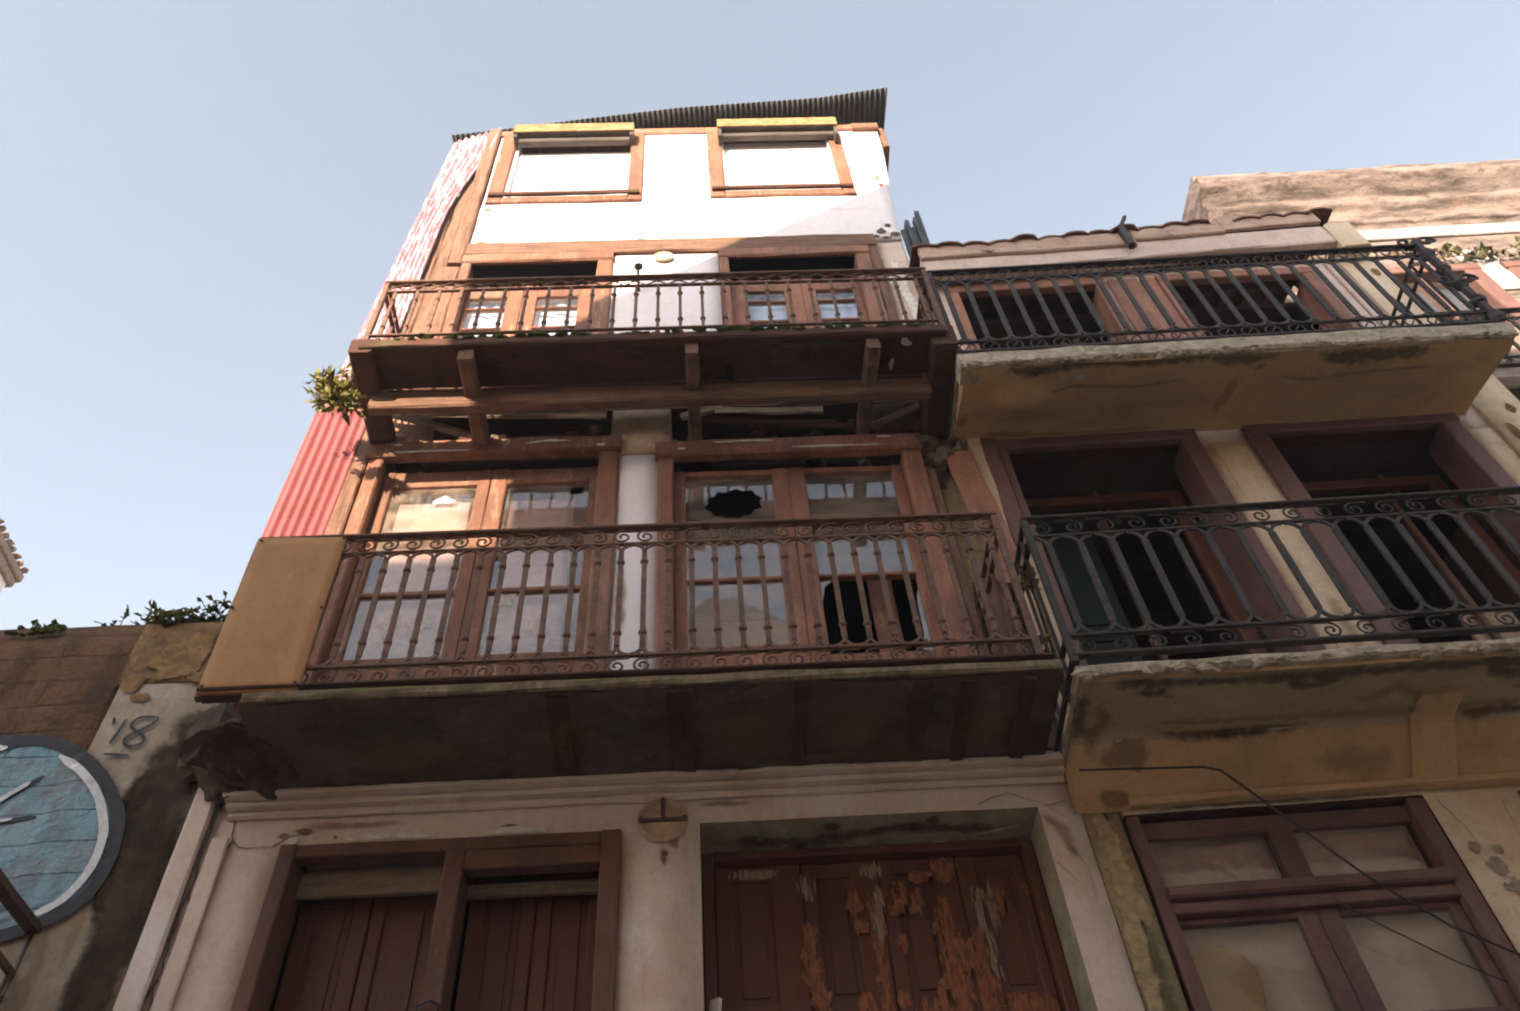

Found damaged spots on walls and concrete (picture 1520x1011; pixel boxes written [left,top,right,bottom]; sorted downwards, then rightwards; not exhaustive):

water stain [1011,355,1276,376]
water stain [1324,346,1428,364]
water stain [1121,657,1520,698]
water stain [1165,724,1297,740]
water stain [703,747,993,770]
water stain [303,765,513,787]
water stain [59,707,216,1011]
peeling [728,869,778,881]
peeling [845,840,1061,1011]
peeling [795,873,834,1011]